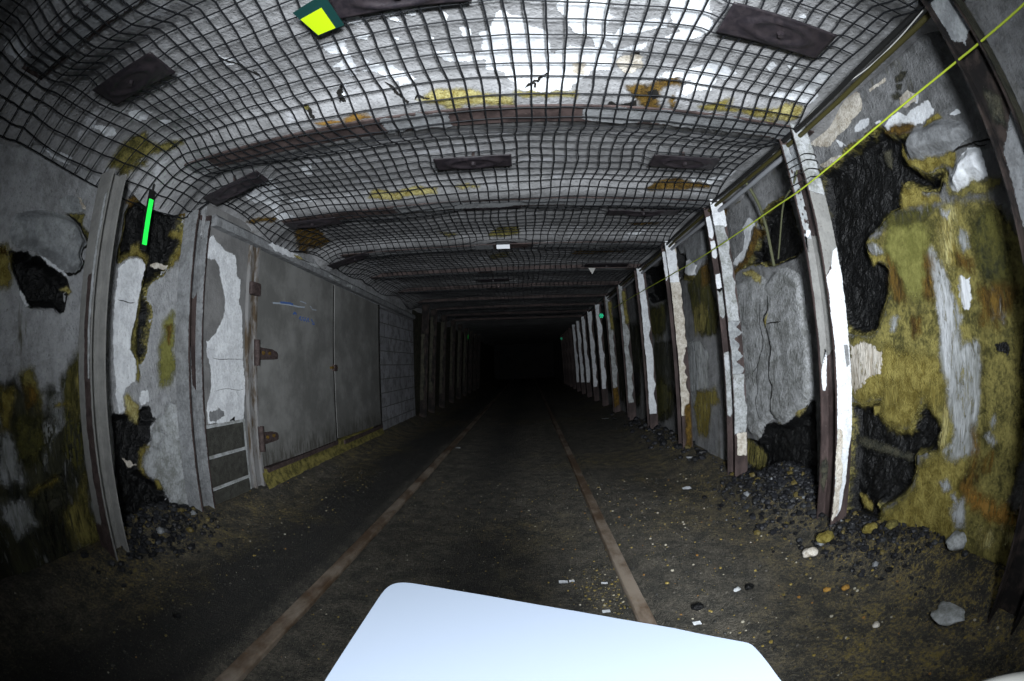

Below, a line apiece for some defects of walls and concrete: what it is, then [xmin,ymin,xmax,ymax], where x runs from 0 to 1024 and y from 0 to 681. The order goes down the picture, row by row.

spalling [9,250,72,314]
spalling [112,195,189,521]
peeling [206,235,245,424]
crack [752,300,781,419]
damp [849,342,883,393]
spalling [811,71,947,337]
damp [928,247,996,463]
damp [959,229,969,251]
damp [0,352,100,579]
spalling [747,400,818,479]
spalling [847,399,943,519]
damp [941,480,965,528]